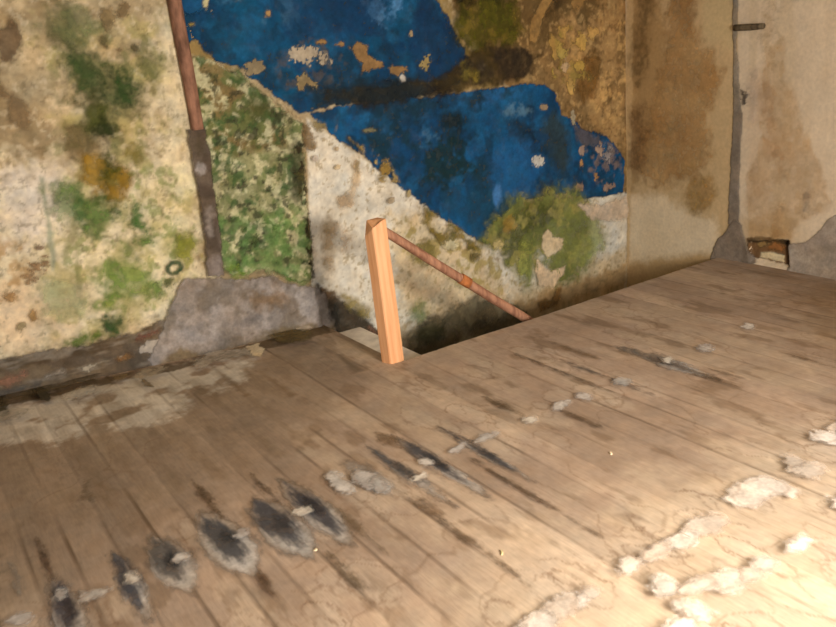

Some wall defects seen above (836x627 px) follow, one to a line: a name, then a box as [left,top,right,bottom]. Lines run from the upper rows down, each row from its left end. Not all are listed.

peeling [182,0,629,241]
damp [631,0,719,211]
flaking render [747,237,790,265]